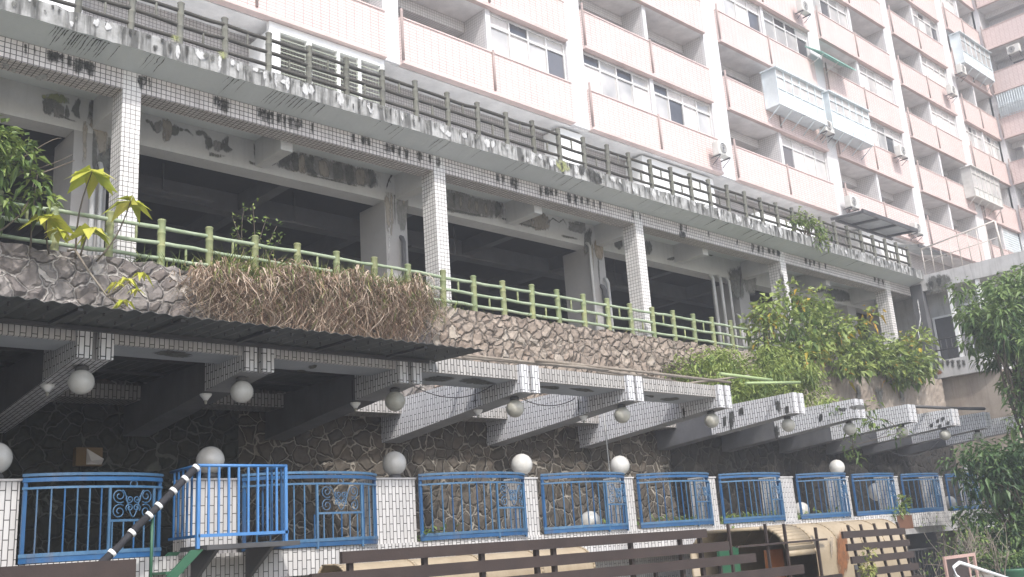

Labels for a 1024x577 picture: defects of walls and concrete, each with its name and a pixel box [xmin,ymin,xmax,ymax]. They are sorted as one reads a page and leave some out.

peeling [42,94,93,121]
peeling [146,119,233,157]
peeling [273,152,377,188]
peeling [446,191,506,220]
peeling [521,213,586,239]